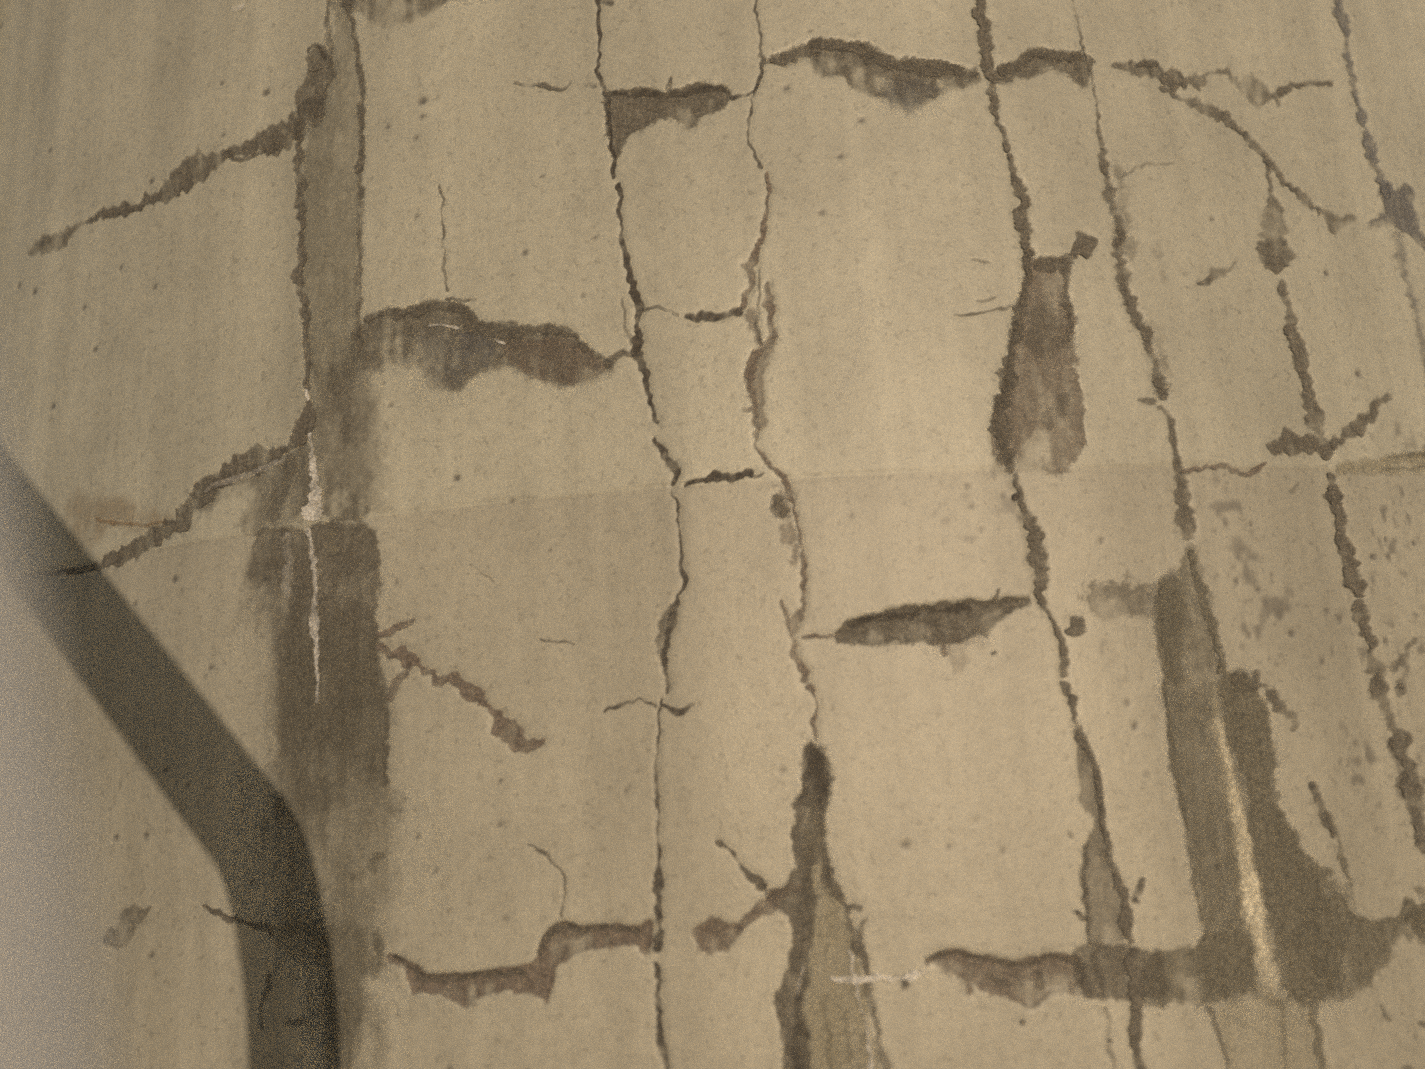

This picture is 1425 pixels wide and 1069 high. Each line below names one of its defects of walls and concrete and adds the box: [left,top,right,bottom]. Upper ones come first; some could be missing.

crack [27,95,325,254]
leakage [325,0,372,196]
spalling [601,76,759,158]
spalling [767,36,1095,98]
leakage [248,45,635,786]
crack [514,0,819,1069]
spalling [802,588,1029,656]
crack [963,0,1170,1069]
crack [1080,0,1425,852]
spalling [386,844,654,1007]
leakage [767,743,927,1069]
leakage [1142,612,1425,1054]